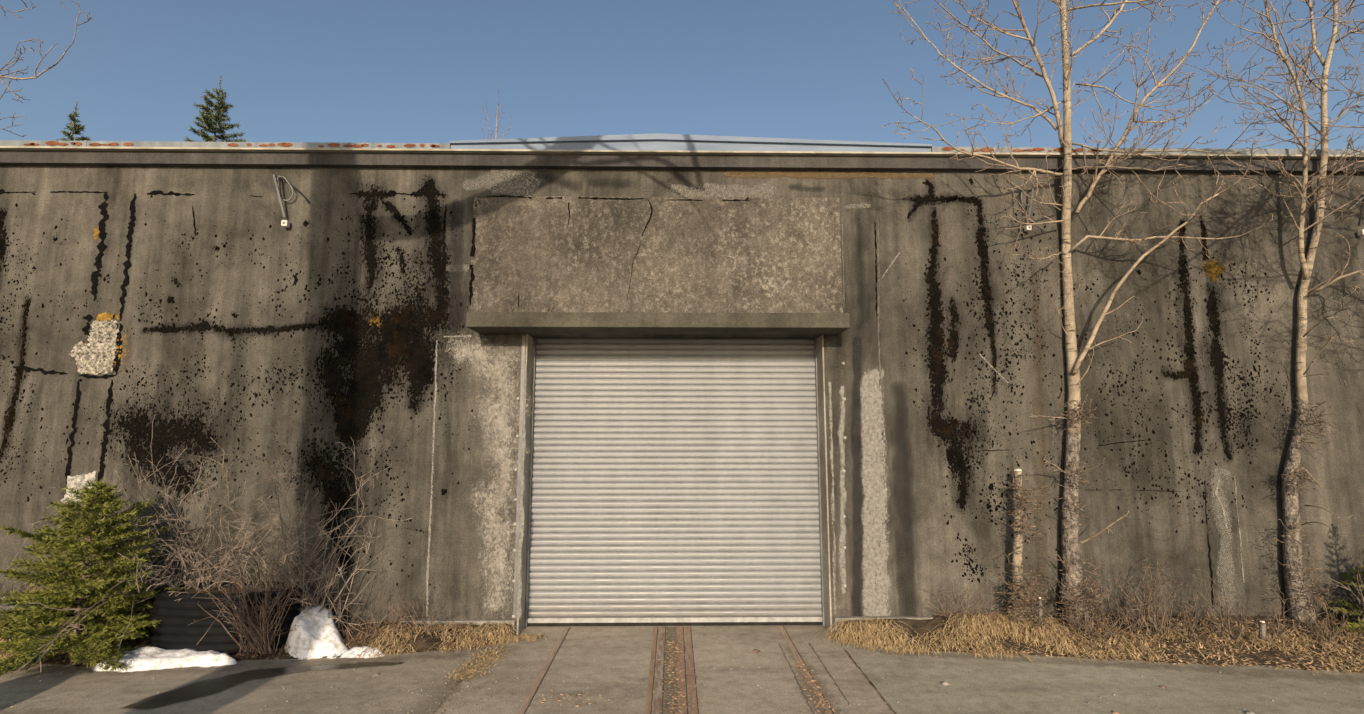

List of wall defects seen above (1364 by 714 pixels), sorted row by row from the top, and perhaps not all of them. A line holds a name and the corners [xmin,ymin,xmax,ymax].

crack [336,193,748,323]
spalling [69,320,119,375]
damp [828,216,915,616]